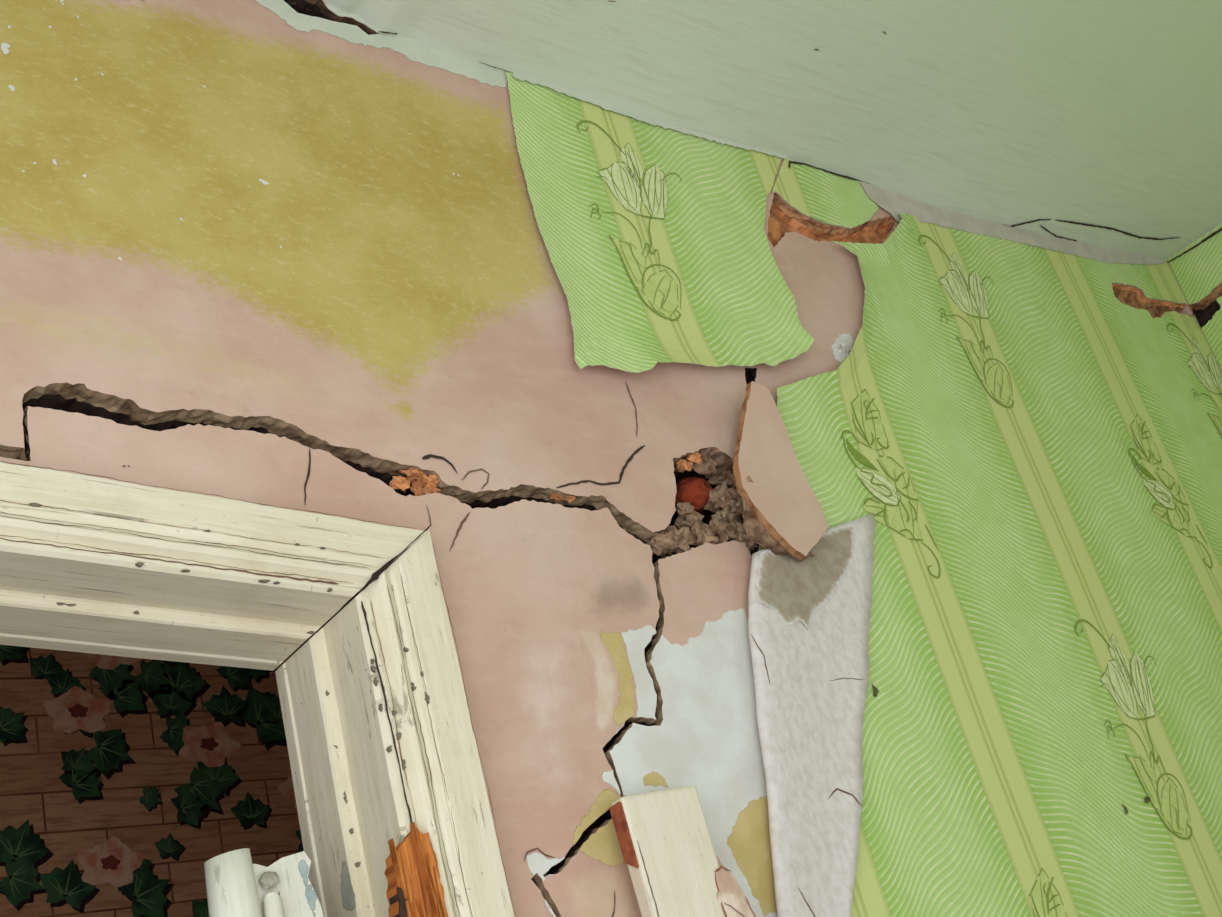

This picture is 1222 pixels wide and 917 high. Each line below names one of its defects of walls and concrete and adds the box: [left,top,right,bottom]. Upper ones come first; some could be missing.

crack [1002,219,1222,263]
crack [1112,283,1222,328]
flaking render [831,333,854,362]
crack [745,368,757,385]
crack [676,452,702,473]
peeling [645,381,829,564]
water stain [755,524,855,629]
crack [1,382,665,917]
peeling [526,606,777,917]